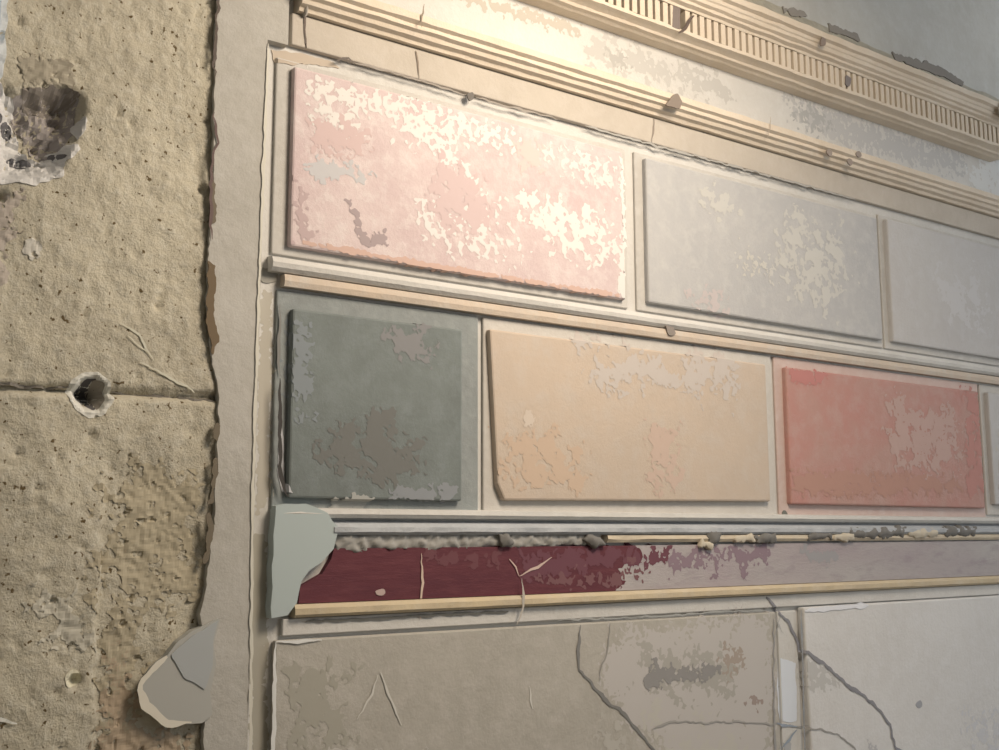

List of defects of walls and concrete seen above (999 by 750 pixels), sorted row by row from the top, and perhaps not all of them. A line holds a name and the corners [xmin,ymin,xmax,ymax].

spalling [0,84,80,169]
spalling [65,372,114,418]
peeling [249,43,627,750]
peeling [881,386,967,480]
crack [306,553,552,624]
peeling [534,557,651,591]
spalling [697,531,722,550]
spalling [733,533,777,544]
spalling [137,655,192,728]
crack [558,597,901,750]